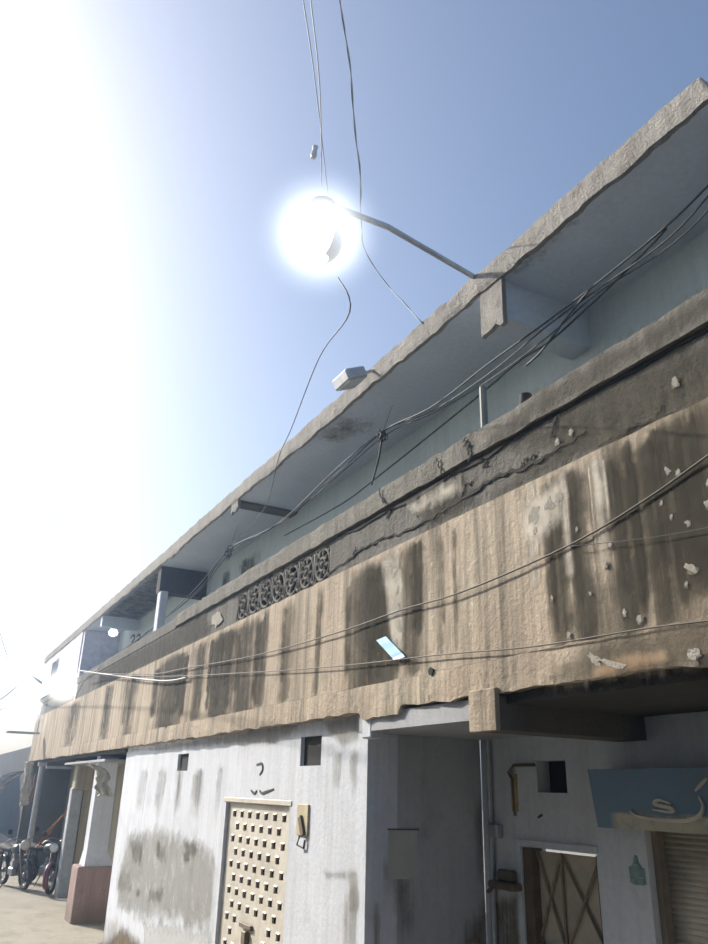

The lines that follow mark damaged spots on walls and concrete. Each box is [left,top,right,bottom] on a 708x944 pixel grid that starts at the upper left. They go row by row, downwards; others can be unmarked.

leakage [106,571,172,619]
leakage [99,614,268,737]
leakage [280,611,290,702]
leakage [345,542,421,688]
leakage [421,476,471,521]
crack [322,328,708,579]
leakage [511,348,708,460]
leakage [529,410,708,678]
flaking render [684,563,699,589]